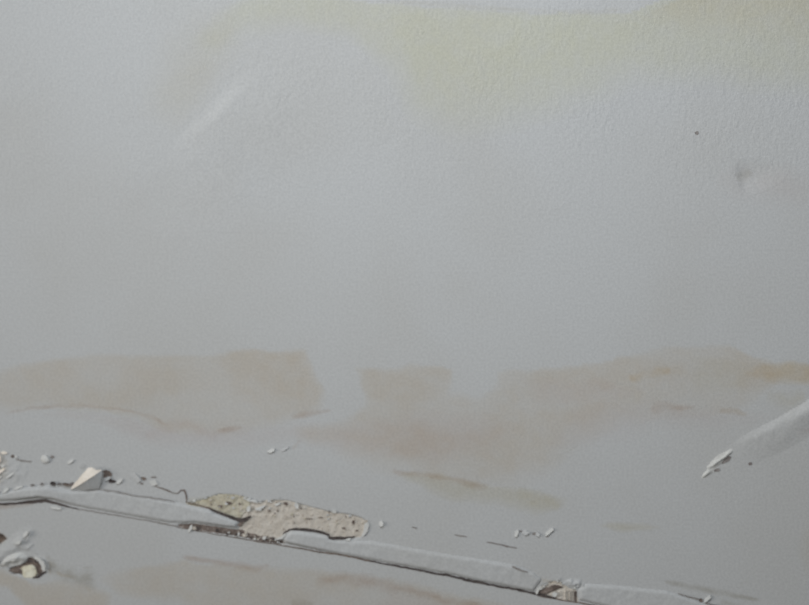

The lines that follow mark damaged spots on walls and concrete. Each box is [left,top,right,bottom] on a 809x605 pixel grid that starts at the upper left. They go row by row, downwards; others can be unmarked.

peeling [31,460,123,491]
spalling [178,494,369,544]